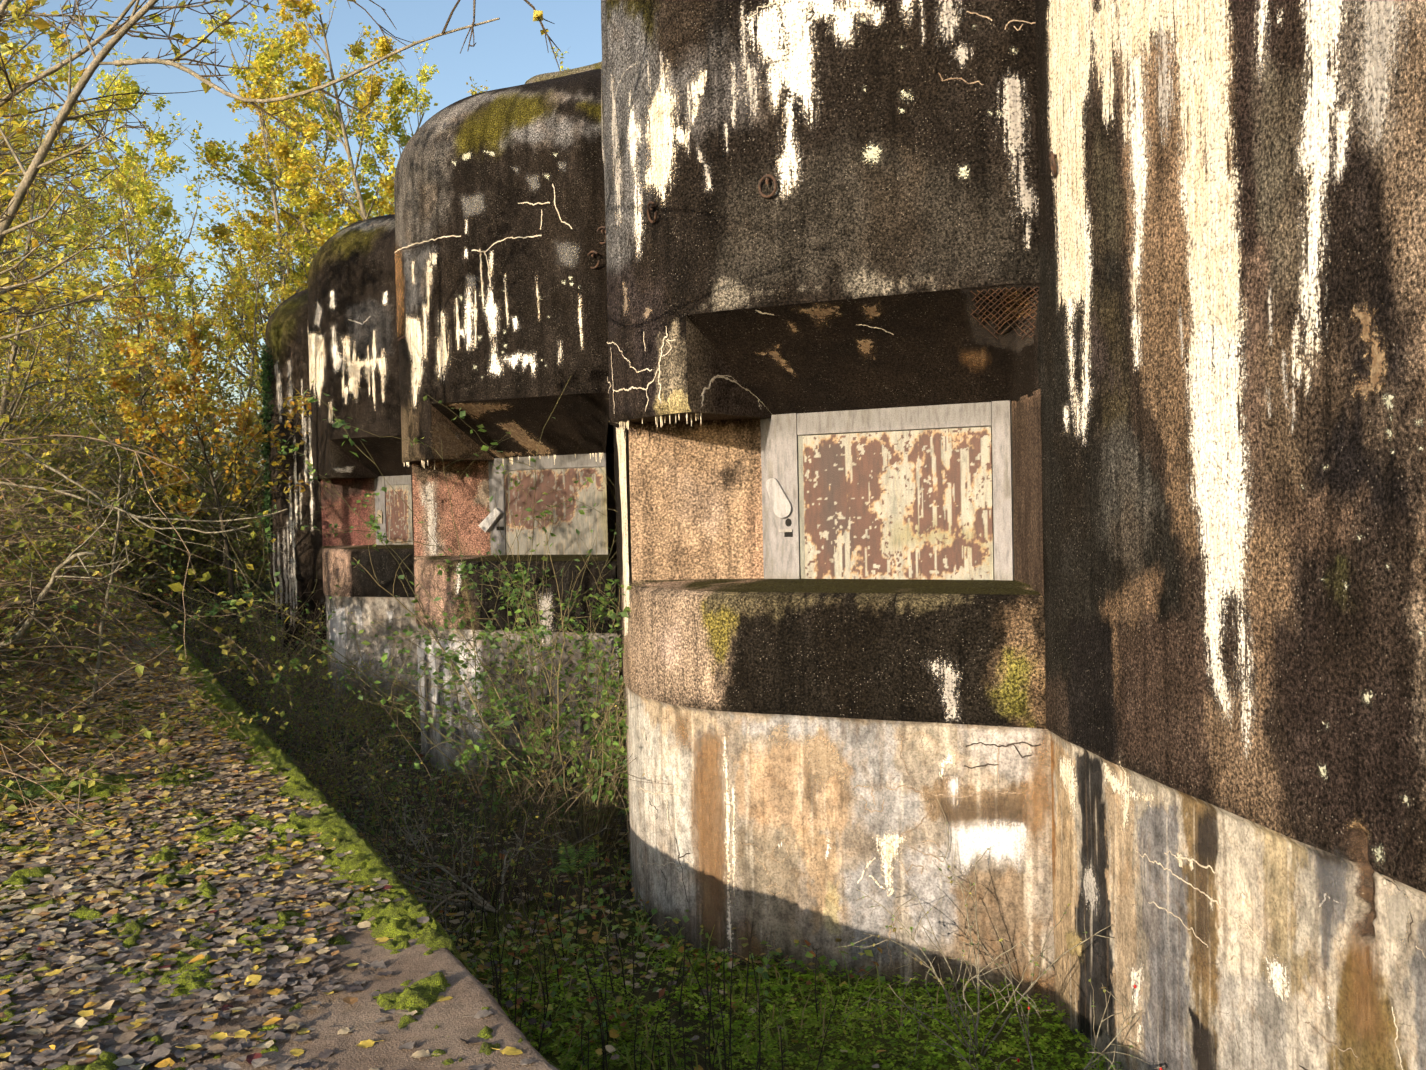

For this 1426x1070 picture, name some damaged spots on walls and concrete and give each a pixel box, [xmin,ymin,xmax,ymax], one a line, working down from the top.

crack [395,184,572,287]
efflorescence [601,52,711,252]
efflorescence [724,0,884,195]
water stain [998,75,1038,248]
water stain [1266,0,1407,431]
efflorescence [273,291,386,650]
crack [607,327,676,414]
crack [701,375,772,414]
water stain [1046,0,1254,757]
rust [681,723,725,953]
crack [854,734,1041,972]
crack [1392,1007,1403,1070]